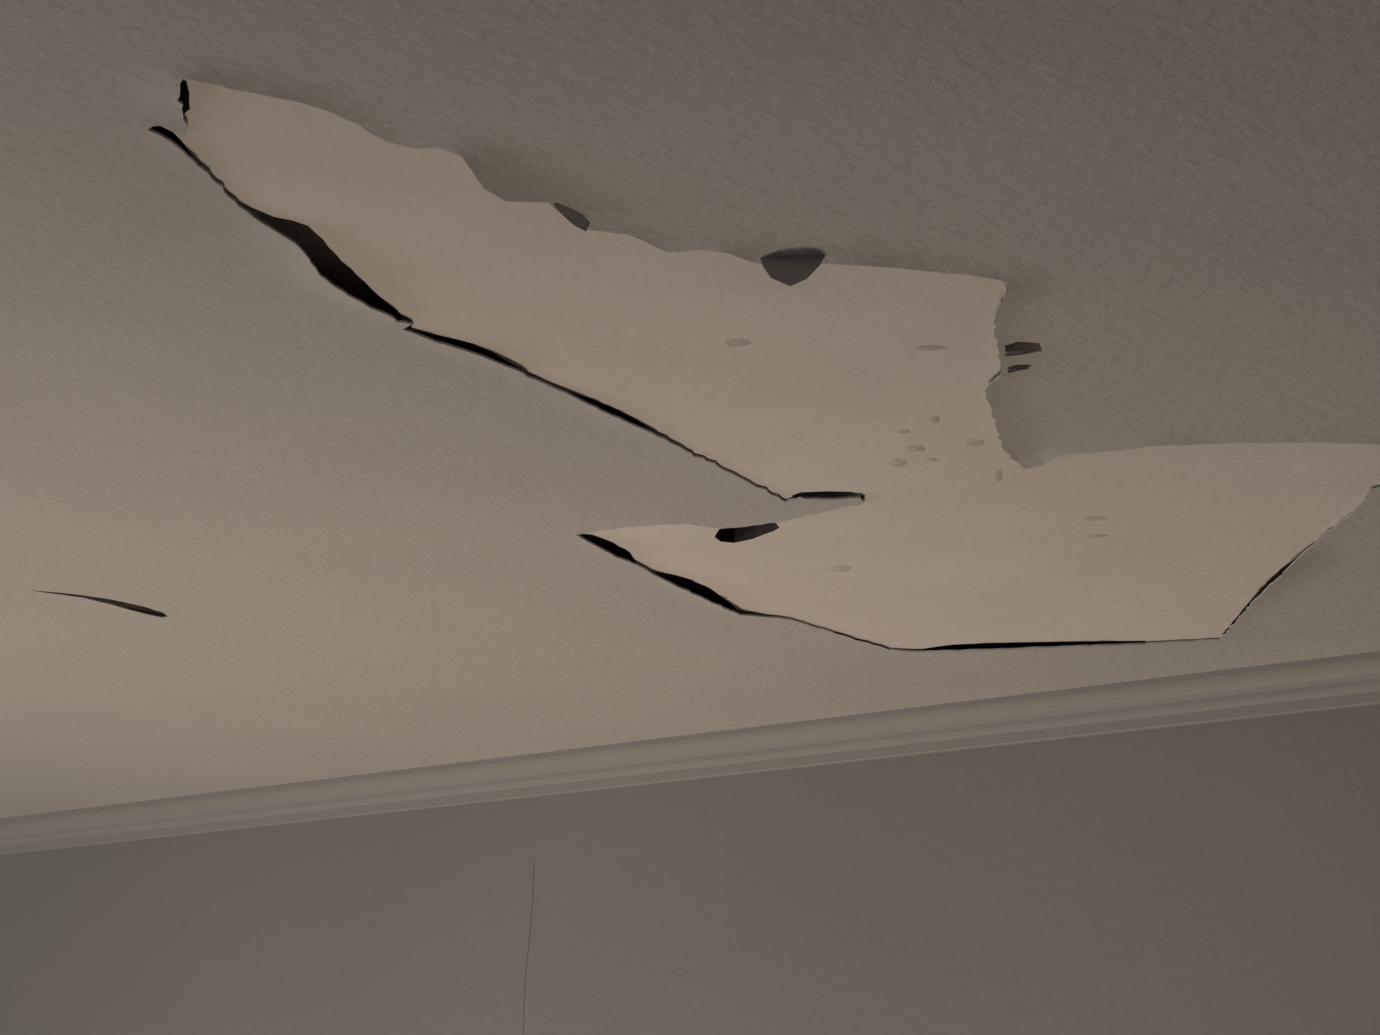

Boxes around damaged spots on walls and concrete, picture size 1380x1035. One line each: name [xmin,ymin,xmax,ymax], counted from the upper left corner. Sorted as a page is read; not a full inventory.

crack [30,589,200,622]
peeling [116,48,1380,656]